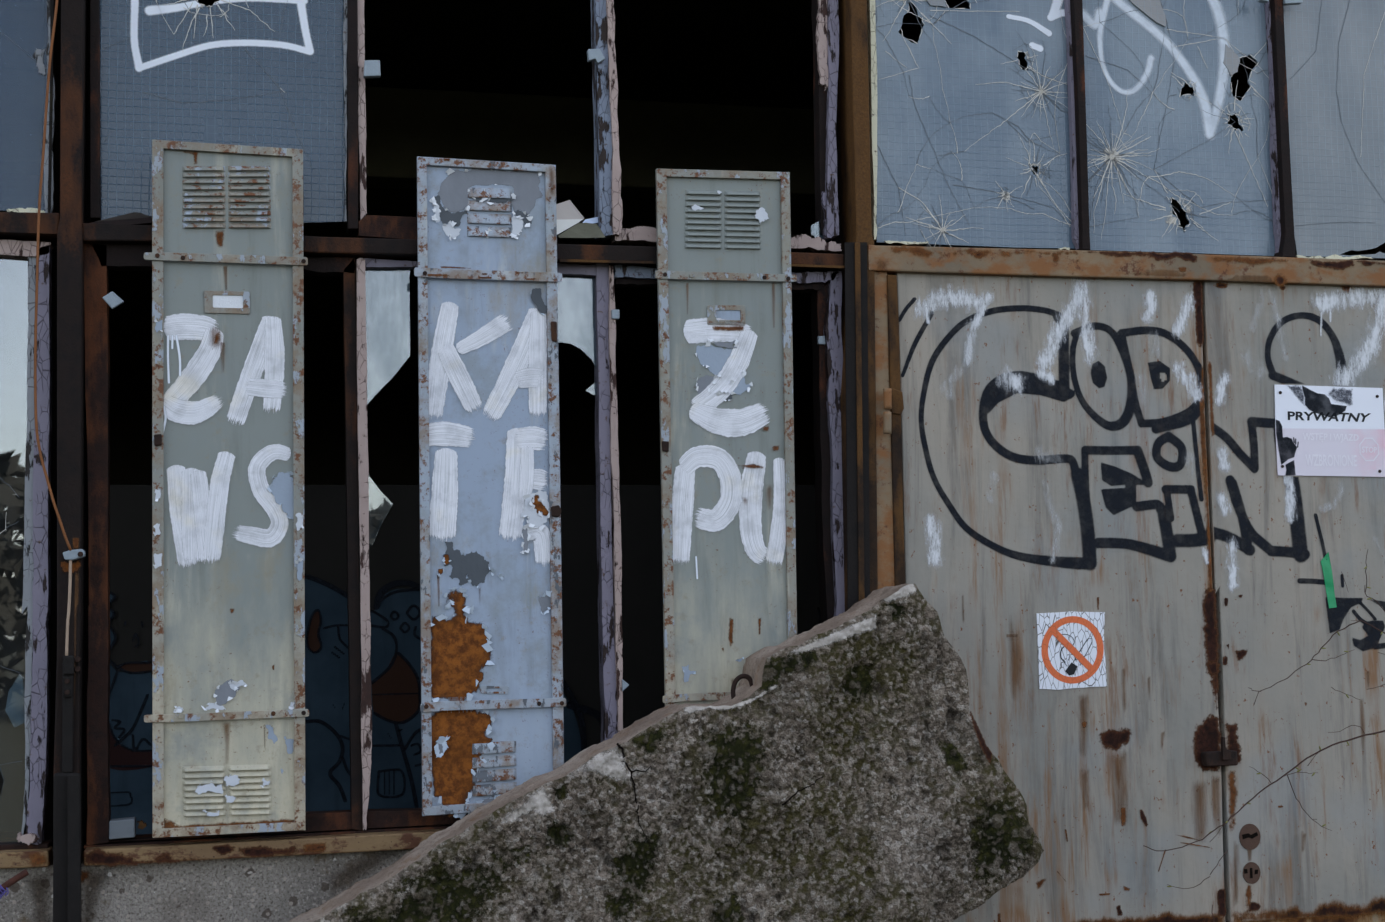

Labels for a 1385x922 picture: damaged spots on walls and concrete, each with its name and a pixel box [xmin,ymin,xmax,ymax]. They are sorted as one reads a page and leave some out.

rust [880,246,932,267]
rust [953,249,1287,347]
rust [1311,260,1385,292]
peeling [695,338,753,401]
peeling [437,539,504,588]
rust [1158,362,1247,872]
peeling [201,679,247,713]
rust [431,575,500,819]
rust [1081,699,1148,827]
rust [1079,850,1385,922]